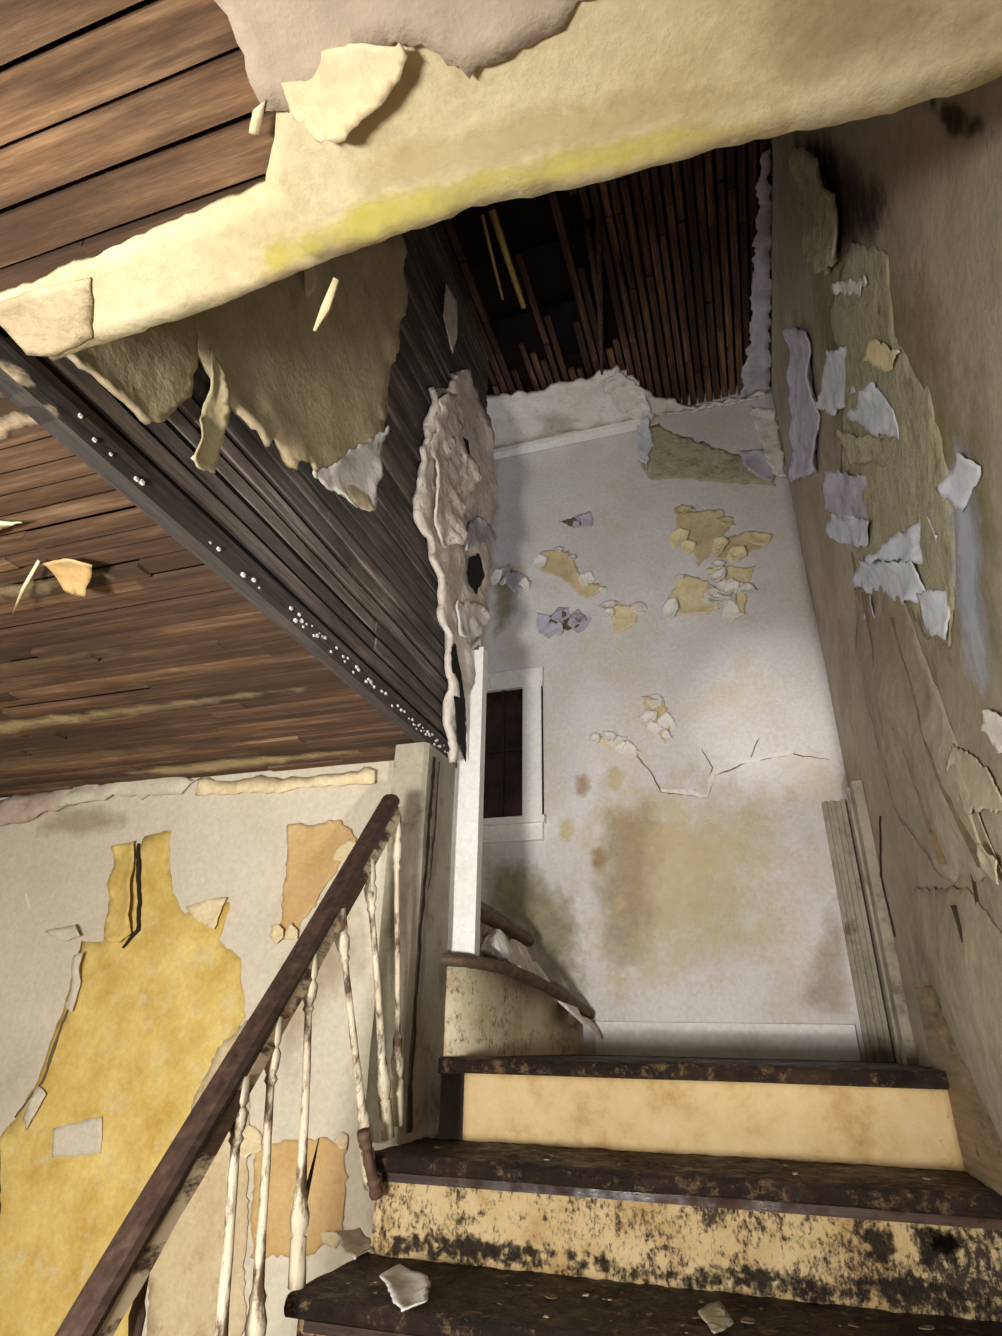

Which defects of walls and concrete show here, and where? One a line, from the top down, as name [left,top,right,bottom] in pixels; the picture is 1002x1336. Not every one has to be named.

flaking render [249,100,265,136]
flaking render [281,42,408,144]
flaking render [0,234,408,512]
peeling [412,145,981,763]
peeling [980,709,1002,755]
peeling [269,820,357,944]
crack [879,816,896,937]
crack [945,743,1002,942]
peeling [0,831,248,1336]
peeling [146,1102,373,1336]
peeling [380,1264,431,1312]
leakage [387,1221,1002,1317]